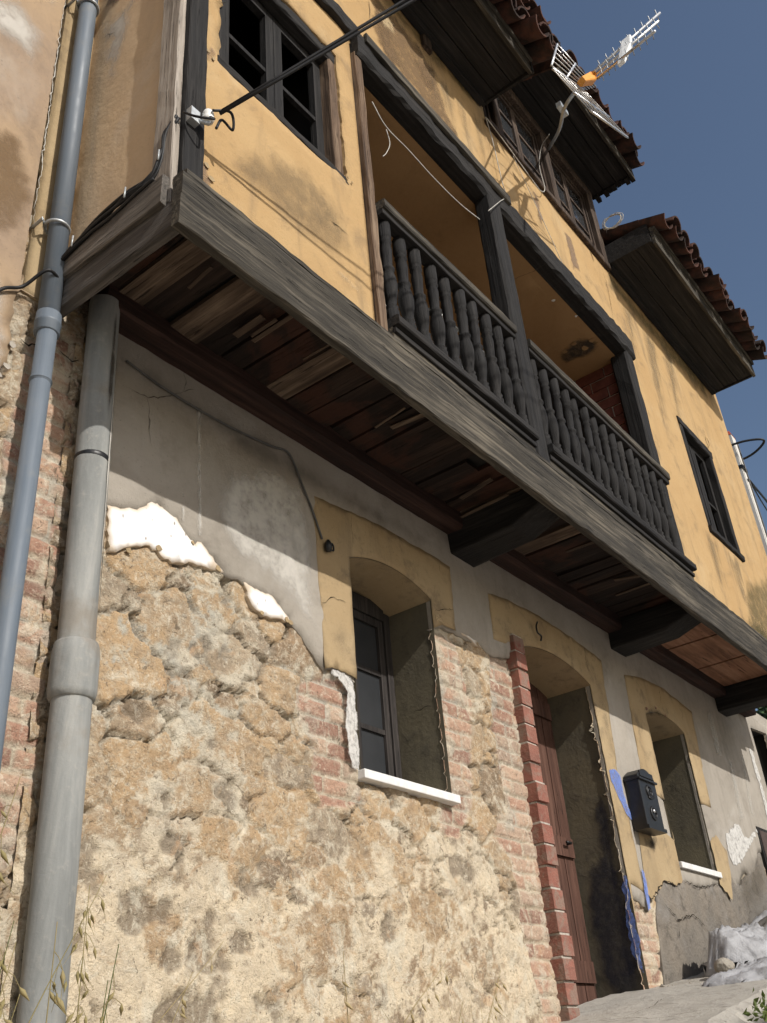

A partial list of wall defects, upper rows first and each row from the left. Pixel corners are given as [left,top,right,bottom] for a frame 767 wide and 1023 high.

water stain [0,136,28,223]
flaking render [105,502,223,573]
flaking render [243,582,293,625]
flaking render [332,669,359,769]
flaking render [726,824,758,866]
crack [650,880,716,936]